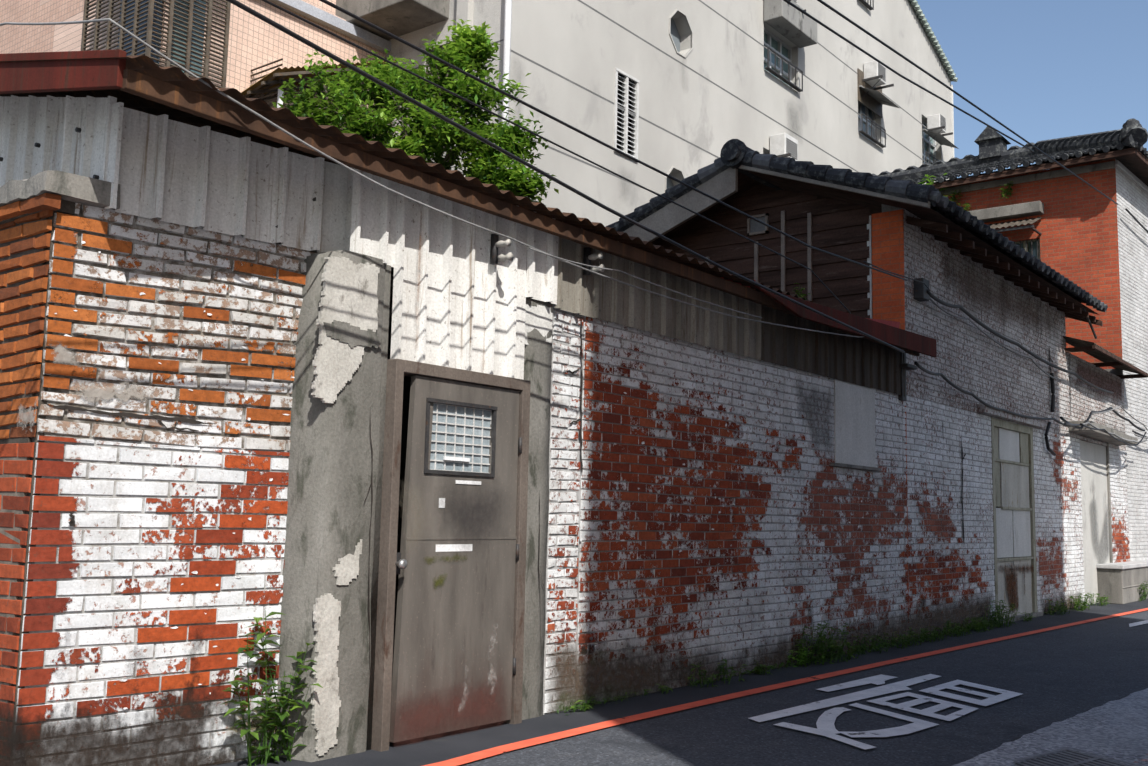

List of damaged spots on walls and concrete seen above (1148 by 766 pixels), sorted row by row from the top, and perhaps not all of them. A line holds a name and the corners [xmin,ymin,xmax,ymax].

crack [45,403,215,431]
peeling [18,436,290,731]
peeling [43,212,306,436]
flaking render [311,256,381,404]
flaking render [332,539,362,585]
peeling [525,304,990,666]
water stain [553,598,992,707]
peeling [1036,433,1081,607]